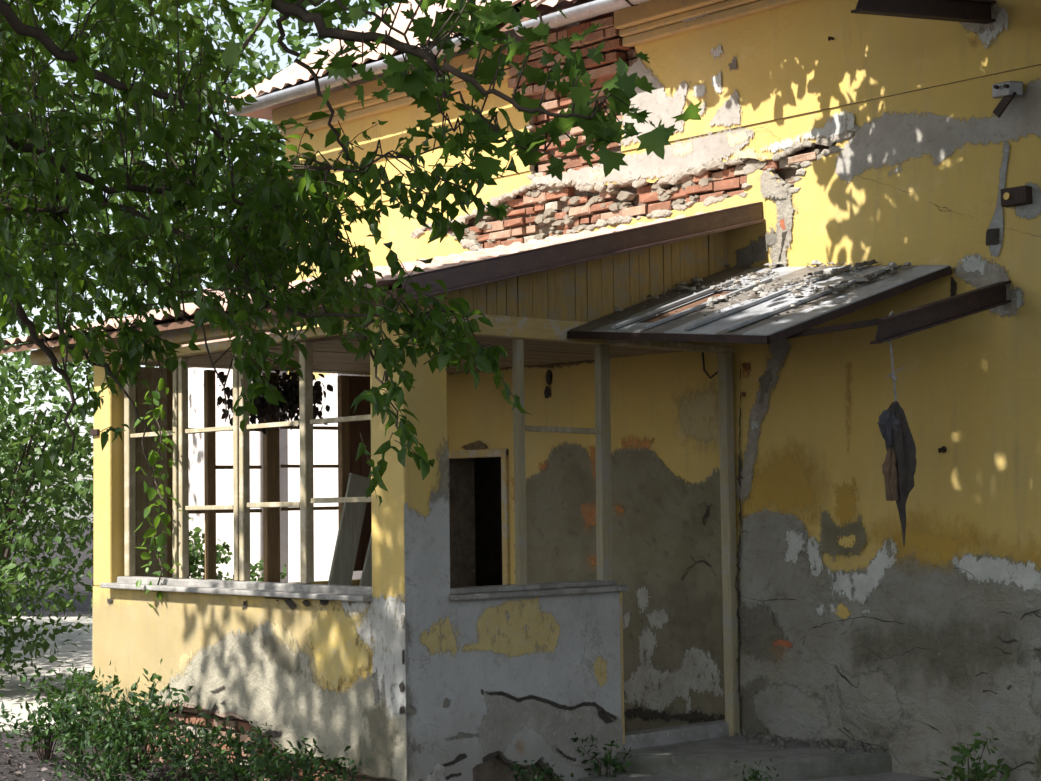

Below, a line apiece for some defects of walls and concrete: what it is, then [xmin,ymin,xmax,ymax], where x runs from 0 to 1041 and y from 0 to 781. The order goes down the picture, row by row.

flaking render [410,223,432,238]
peeling [447,7,1041,251]
peeling [288,408,300,582]
peeling [313,373,365,581]
peeling [98,436,725,781]
peeling [737,506,1041,781]
crack [976,609,1041,694]